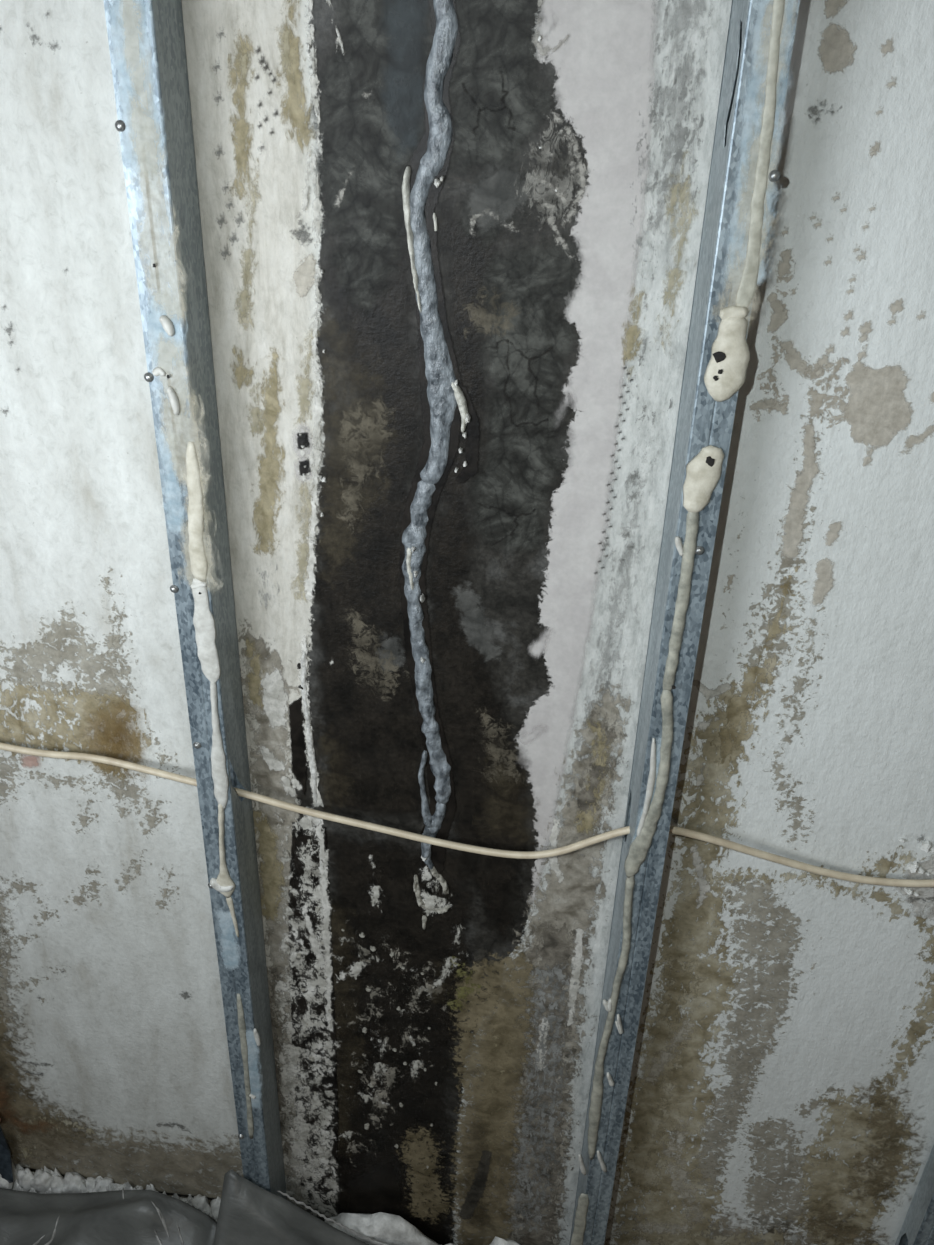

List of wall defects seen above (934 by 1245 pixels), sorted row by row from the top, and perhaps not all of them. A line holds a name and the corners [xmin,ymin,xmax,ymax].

mould [632,53,705,317]
water stain [818,0,857,74]
water stain [881,39,894,56]
water stain [0,568,244,1204]
water stain [215,0,631,1245]
water stain [605,249,934,1245]